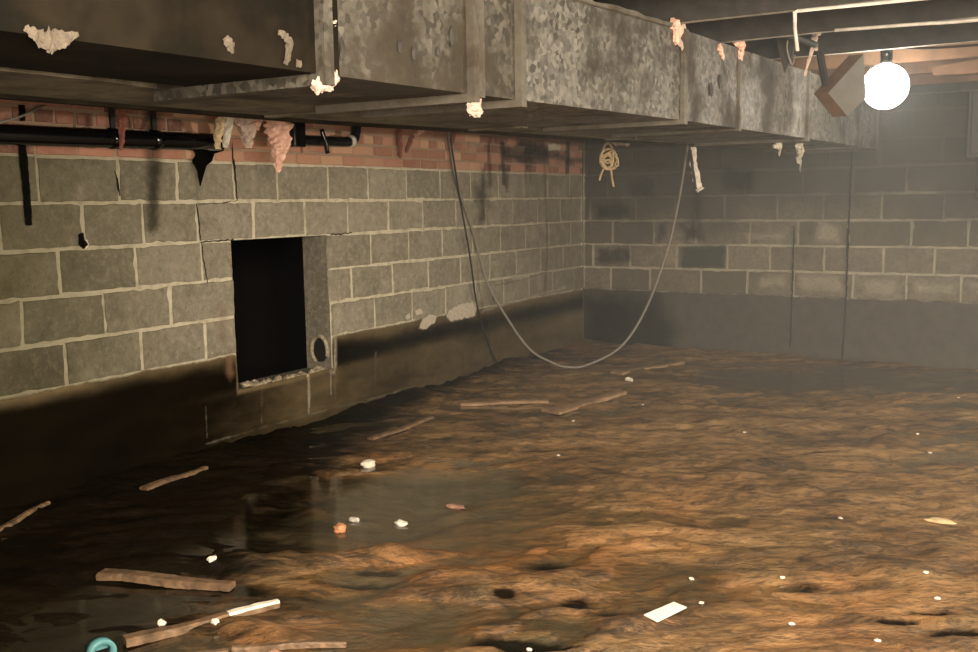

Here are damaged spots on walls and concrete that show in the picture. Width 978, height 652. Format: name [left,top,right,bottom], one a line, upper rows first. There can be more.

crack [196,142,238,283]
water stain [0,288,978,509]